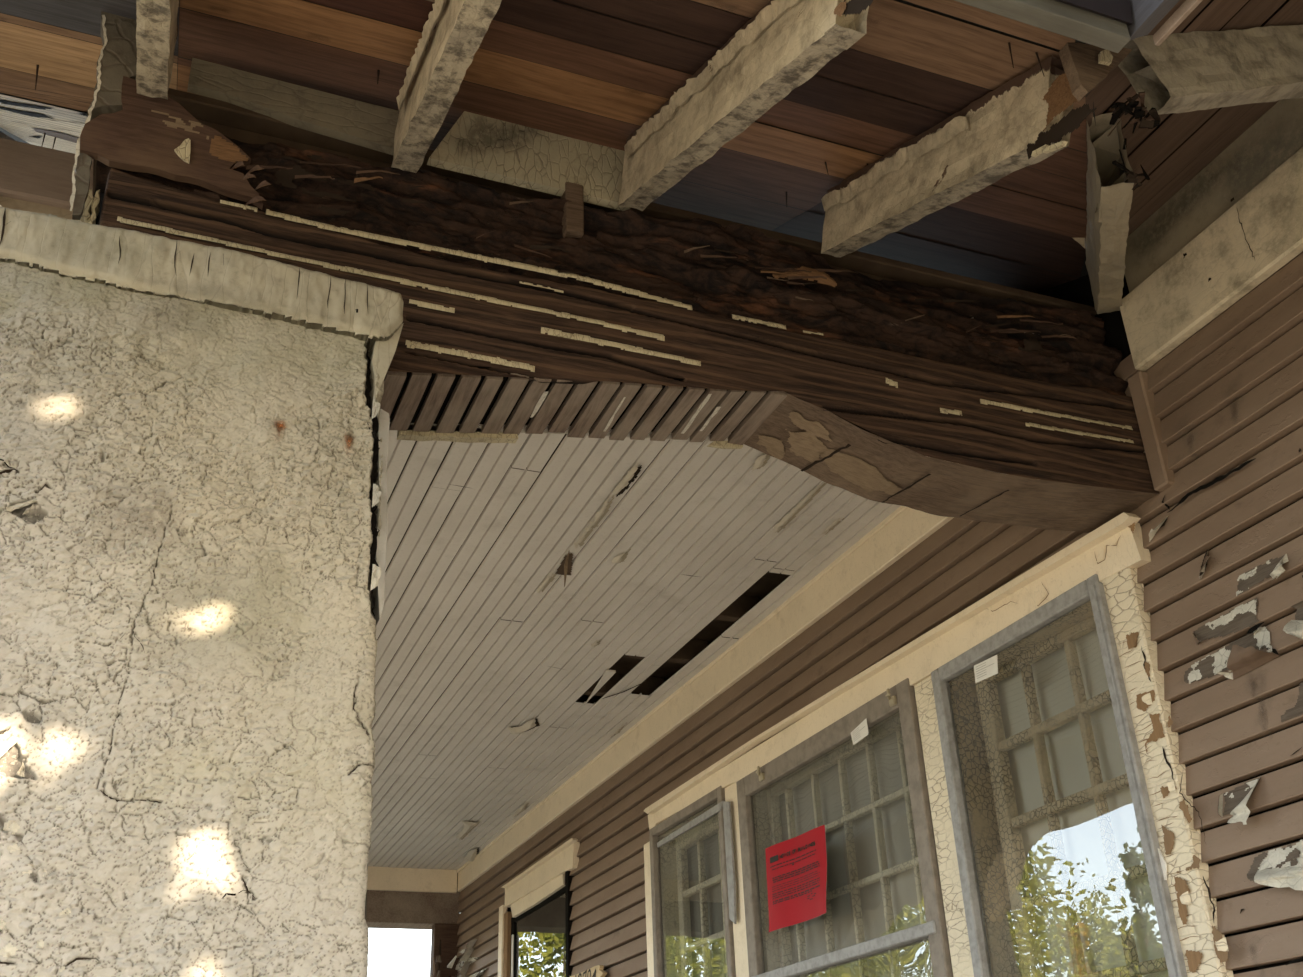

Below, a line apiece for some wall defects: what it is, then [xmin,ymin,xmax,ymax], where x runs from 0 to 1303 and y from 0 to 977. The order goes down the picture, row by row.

peeling [174,138,191,164]
crack [0,208,11,244]
crack [174,243,224,276]
crack [297,267,368,314]
crack [0,459,48,494]
crack [365,349,381,616]
peeling [1184,554,1303,684]
peeling [1136,661,1173,753]
peeling [1218,777,1260,825]
peeling [1247,839,1303,890]
peeling [1174,855,1201,925]
peeling [1185,925,1229,973]